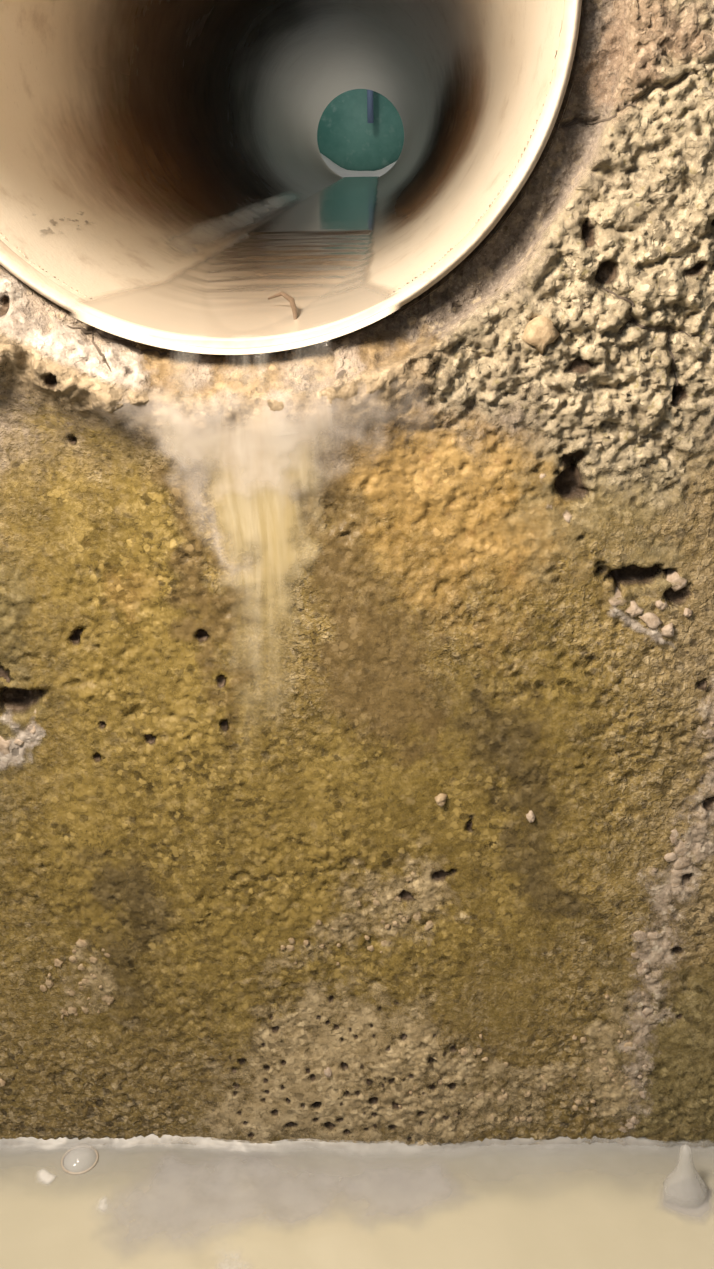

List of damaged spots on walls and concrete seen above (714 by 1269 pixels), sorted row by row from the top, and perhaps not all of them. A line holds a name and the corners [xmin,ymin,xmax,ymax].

crack [563,71,696,126]
water stain [155,465,242,671]
water stain [296,478,582,915]
spalling [596,564,693,647]
water stain [91,865,166,996]
water stain [616,677,714,1143]